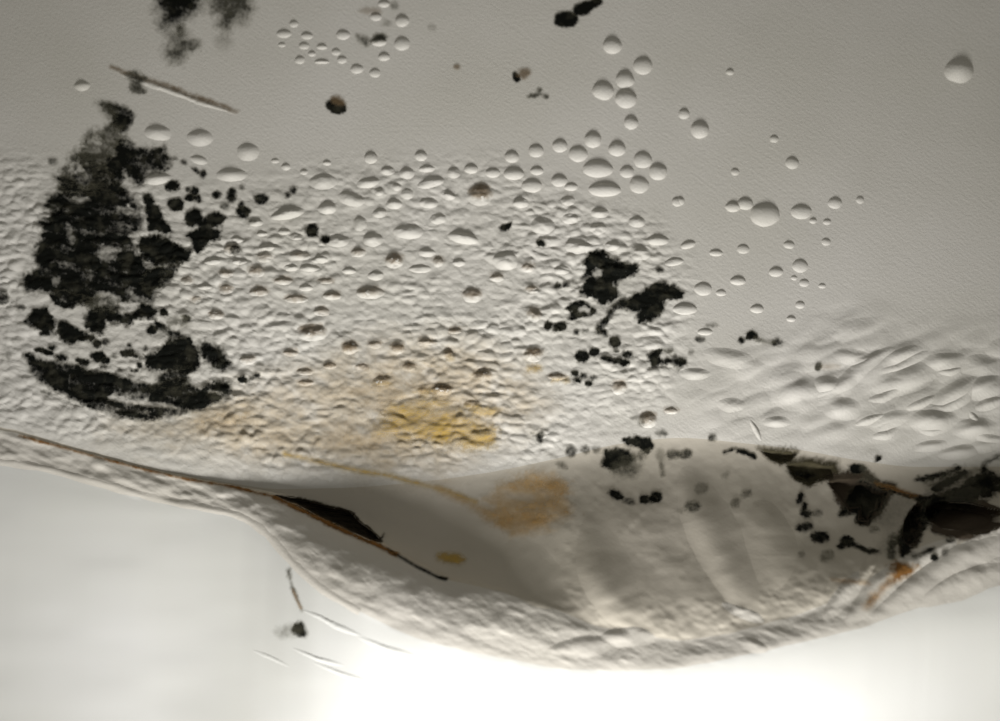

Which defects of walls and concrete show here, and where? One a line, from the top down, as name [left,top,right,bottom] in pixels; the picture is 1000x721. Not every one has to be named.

water stain [157,0,200,60]
water stain [211,0,251,28]
water stain [554,0,602,28]
water stain [0,102,269,421]
water stain [544,249,687,387]
water stain [380,391,495,445]
water stain [561,432,667,475]
water stain [661,450,692,476]
crack [23,436,448,580]
water stain [609,490,662,504]
water stain [789,455,1000,561]